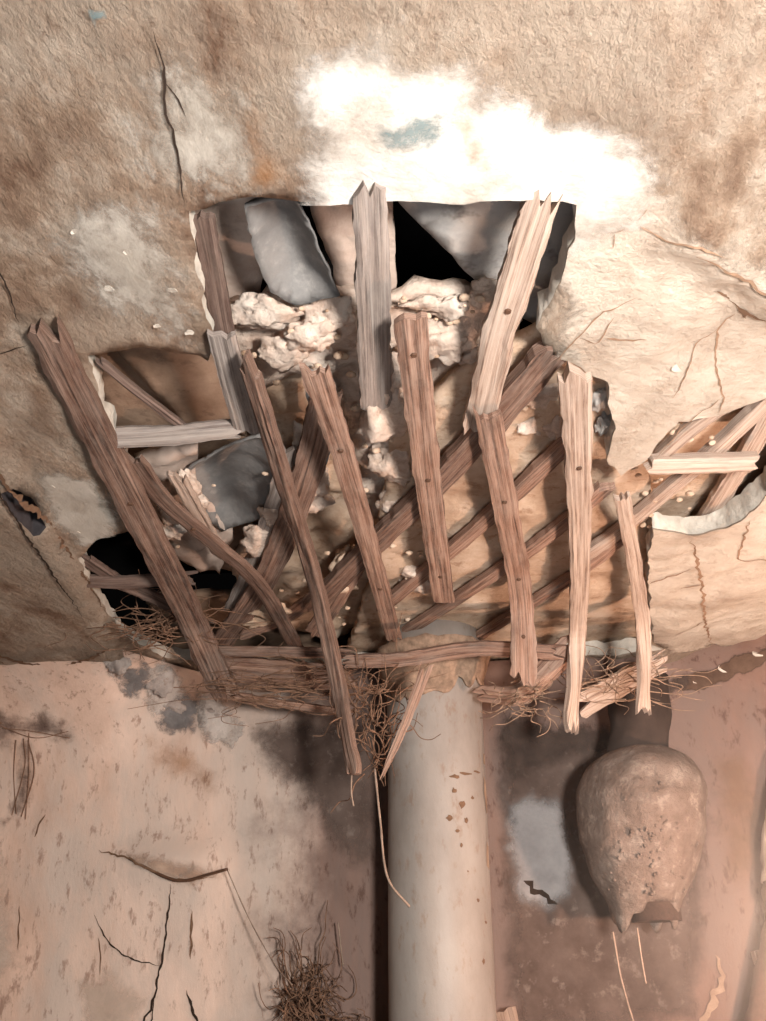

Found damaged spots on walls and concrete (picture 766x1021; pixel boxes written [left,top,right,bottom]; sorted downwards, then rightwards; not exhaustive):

crack [154,35,186,204]
crack [0,273,19,322]
peeling [56,205,194,335]
peeling [301,55,766,476]
crack [603,209,766,456]
crack [0,655,40,665]
crack [0,474,106,616]
peeling [38,473,118,546]
crack [66,648,109,665]
spalling [104,657,243,748]
peeling [647,497,766,693]
crack [94,886,171,1021]